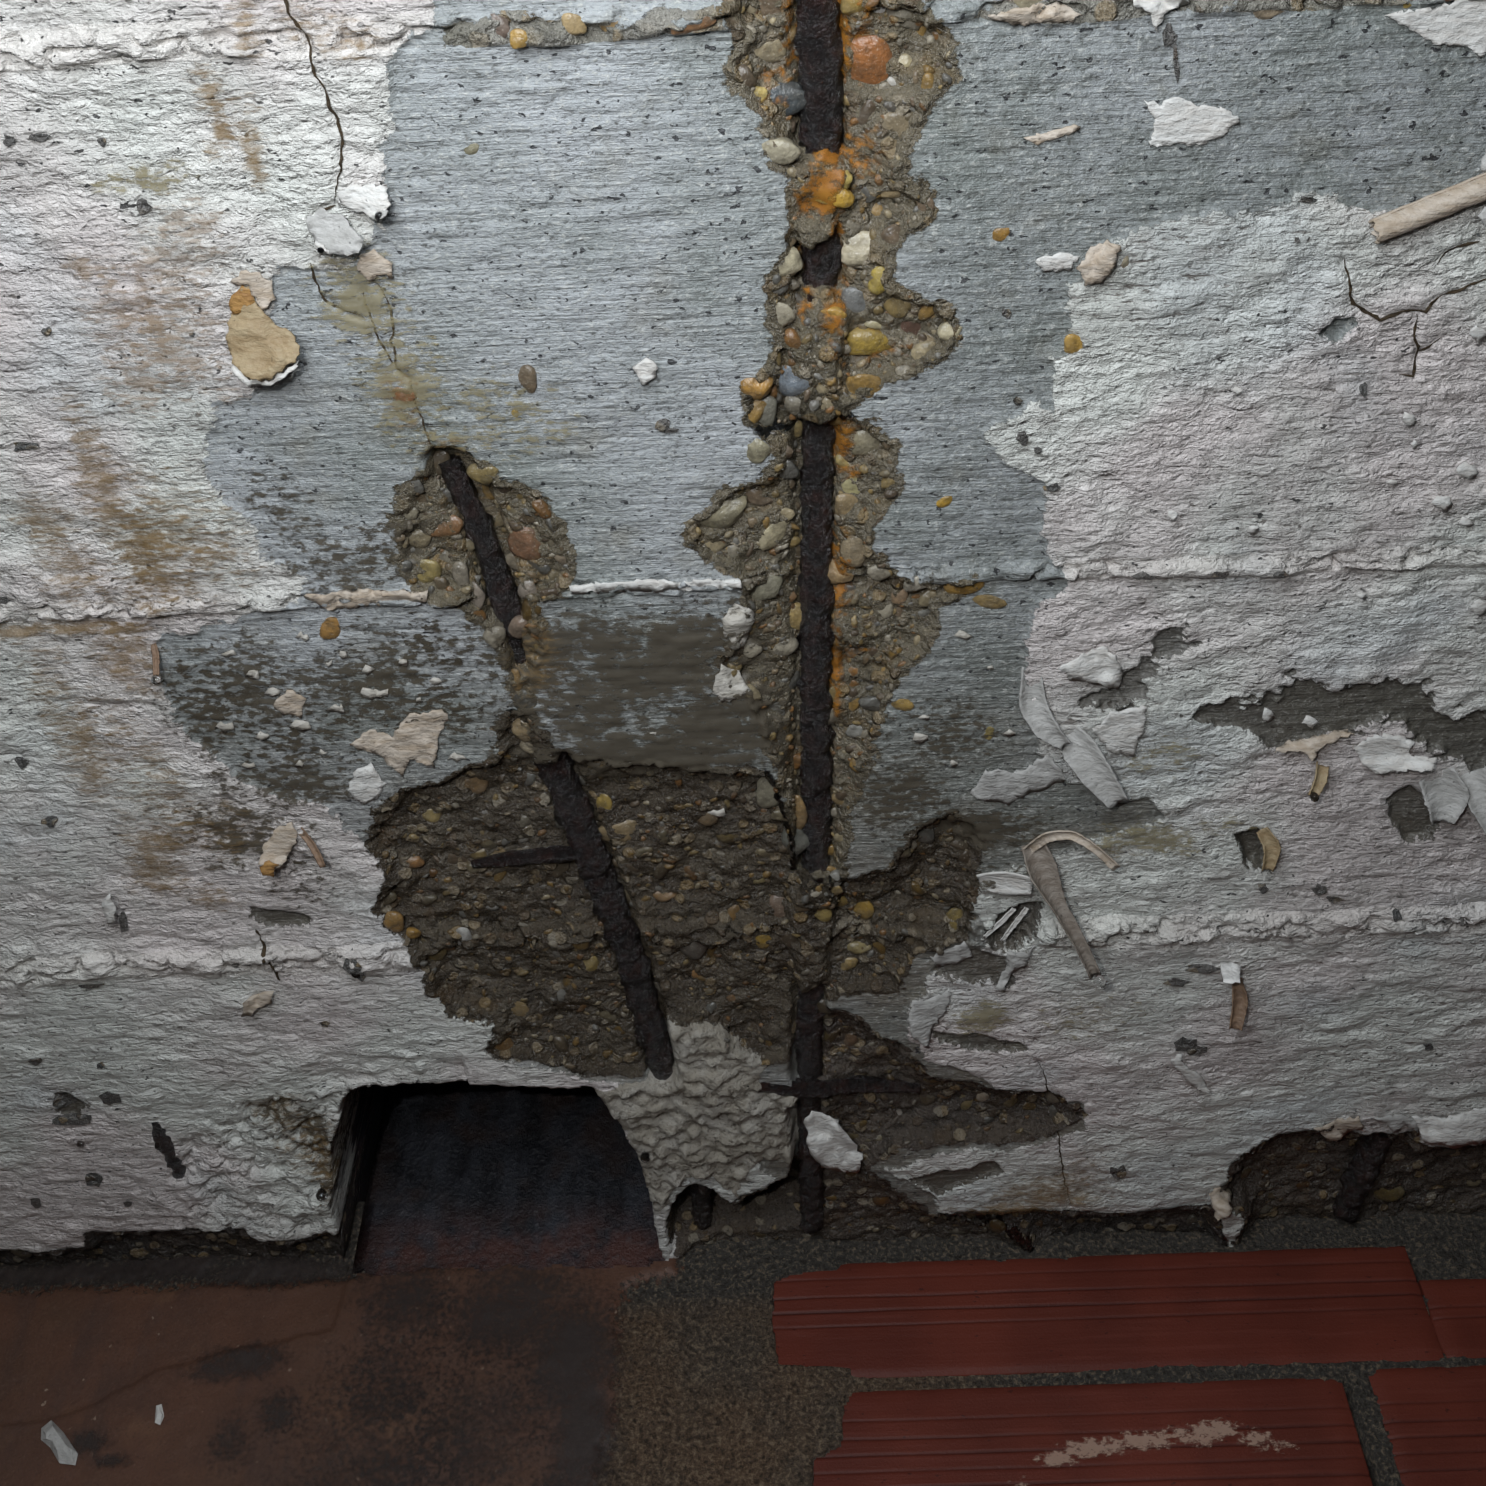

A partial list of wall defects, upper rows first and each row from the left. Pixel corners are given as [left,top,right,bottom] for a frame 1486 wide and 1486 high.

spalling [136,198,152,215]
crack [283,0,344,210]
crack [310,263,432,447]
corrosion [766,0,872,333]
crack [1344,241,1486,378]
peeling [148,0,1486,1259]
corrosion [796,418,867,873]
corrosion [747,984,920,1234]